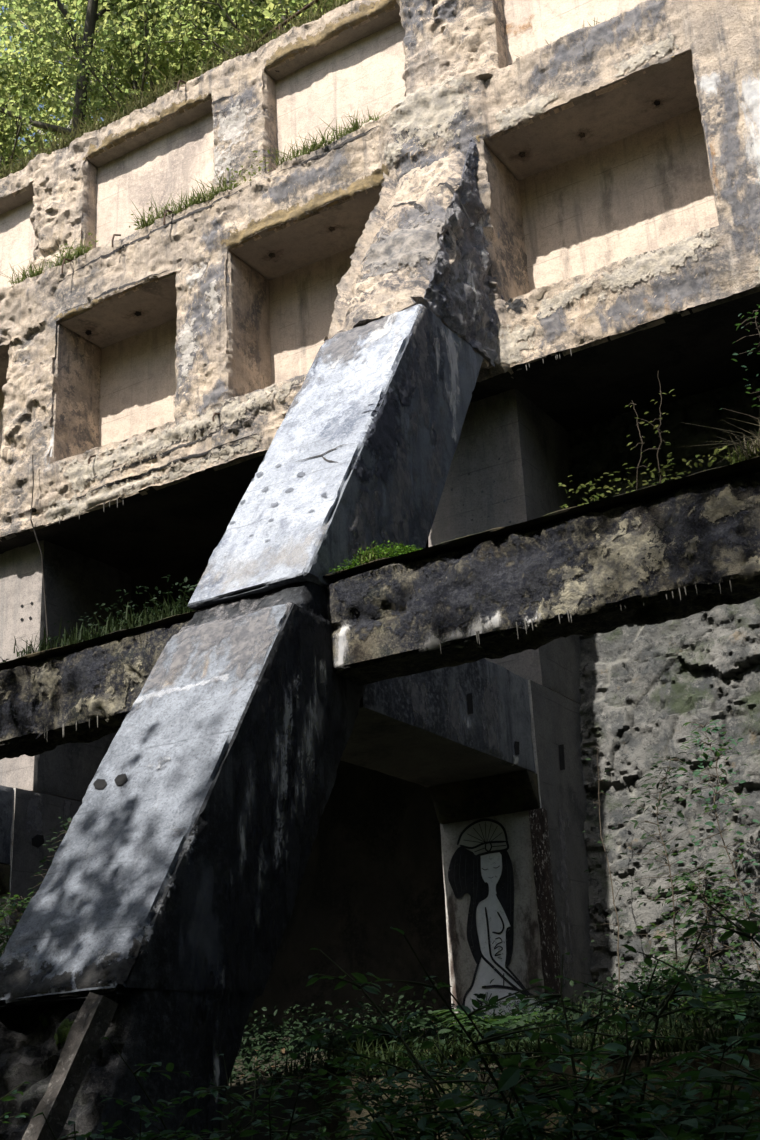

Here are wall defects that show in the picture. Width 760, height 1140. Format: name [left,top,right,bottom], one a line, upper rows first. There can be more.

damp [529,0,666,93]
damp [262,151,347,203]
damp [390,102,477,186]
damp [696,61,760,254]
damp [595,259,712,334]
crack [299,443,355,462]
damp [643,479,759,585]
damp [135,168,593,1140]
damp [0,691,48,744]
spalling [170,825,196,856]
spalling [0,876,175,1004]